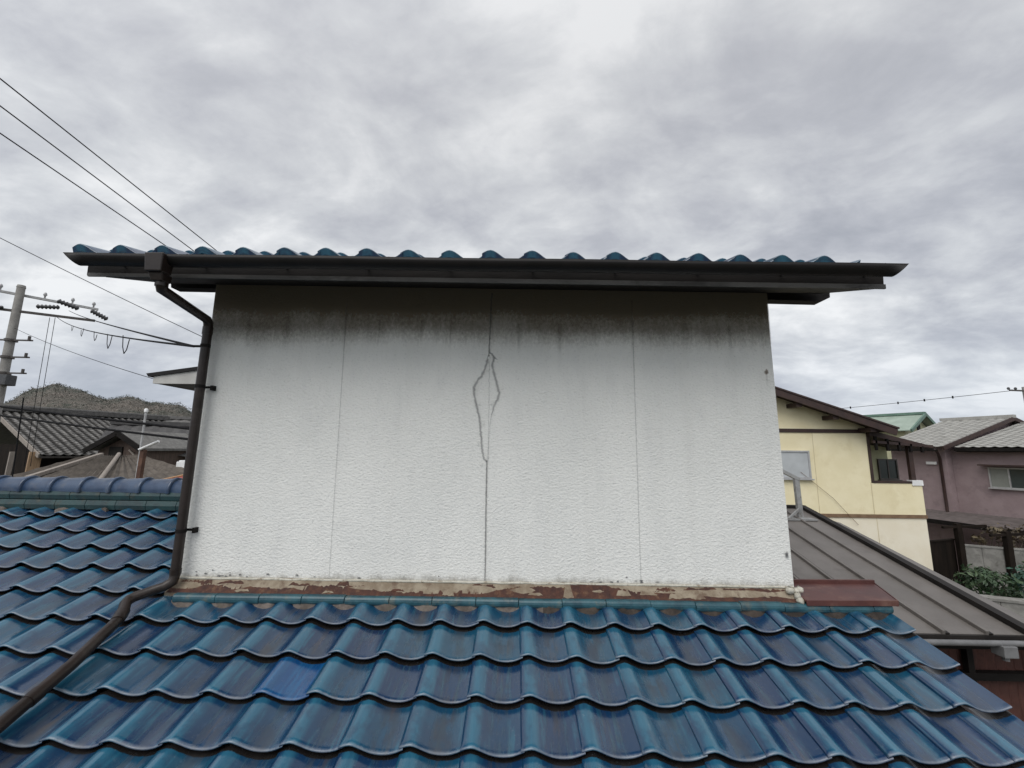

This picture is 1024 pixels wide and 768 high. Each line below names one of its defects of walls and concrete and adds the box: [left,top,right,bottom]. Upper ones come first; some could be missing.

leakage [213,285,769,336]
crack [473,293,503,571]
peeling [590,577,659,596]